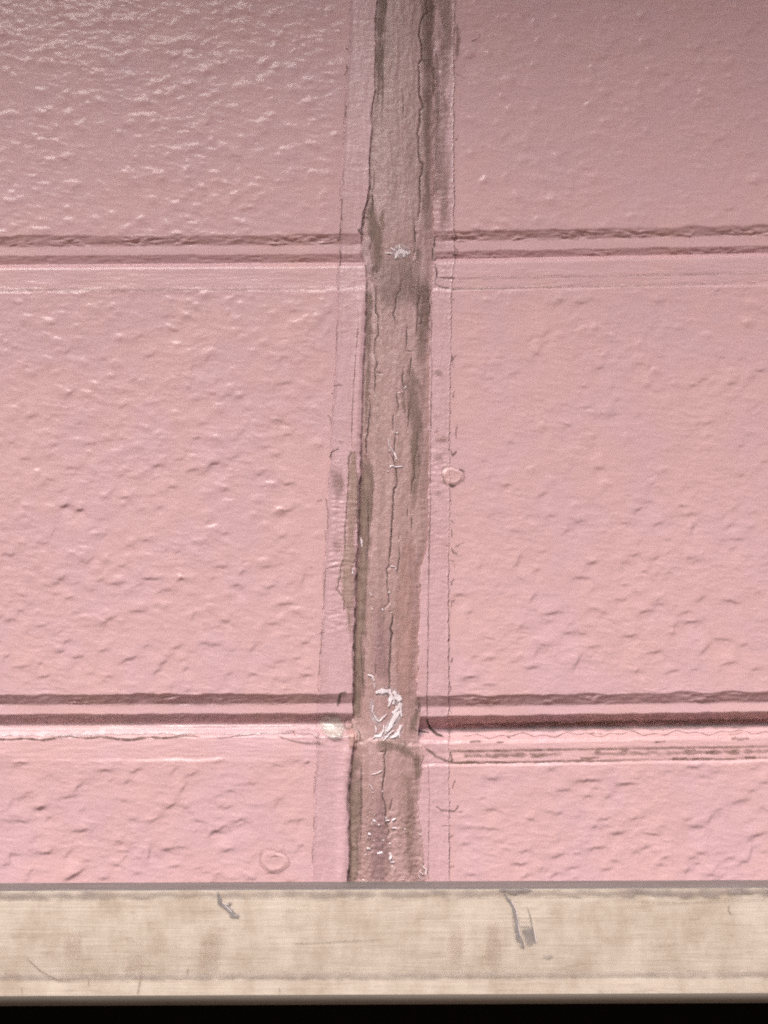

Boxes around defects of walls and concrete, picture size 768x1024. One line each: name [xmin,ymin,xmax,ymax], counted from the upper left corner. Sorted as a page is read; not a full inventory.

crack [329,3,457,737]
peeling [336,451,363,621]
crack [358,730,392,833]
peeling [368,674,402,741]